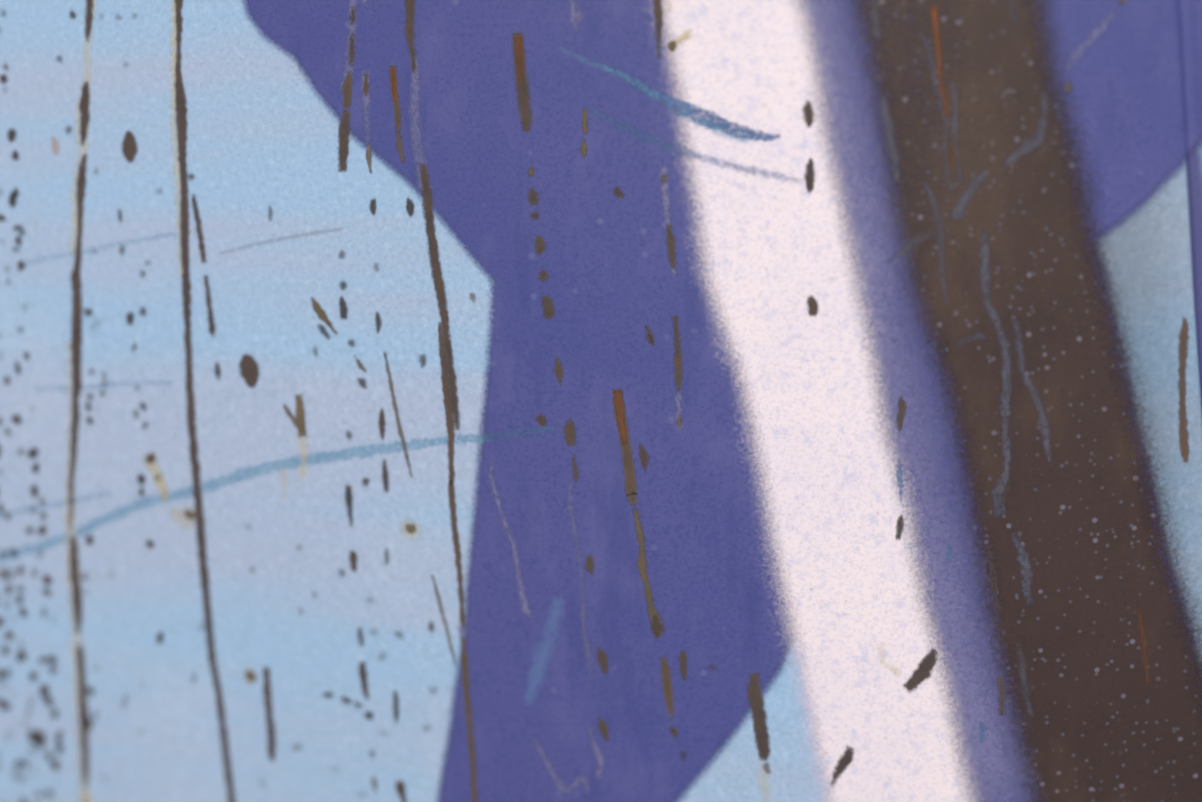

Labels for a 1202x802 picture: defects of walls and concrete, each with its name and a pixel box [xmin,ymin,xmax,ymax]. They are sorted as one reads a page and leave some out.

rust [512,32,532,132]
rust [8,129,19,160]
rust [0,189,24,245]
rust [27,448,46,535]
rust [612,389,664,637]
rust [0,550,27,617]
rust [0,618,58,718]
rust [29,731,63,770]
rust [660,657,677,737]
rust [747,673,771,773]